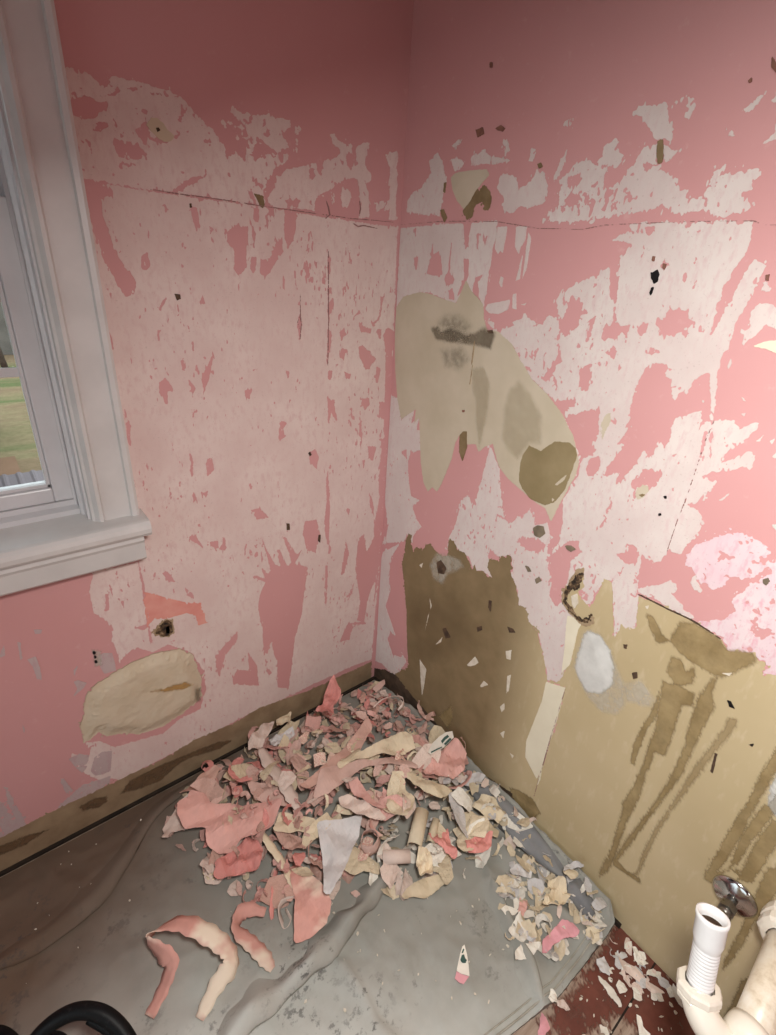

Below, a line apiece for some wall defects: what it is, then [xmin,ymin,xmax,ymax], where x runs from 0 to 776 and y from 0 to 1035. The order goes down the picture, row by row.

crack [150,189,759,230]
peeling [58,67,776,808]
peeling [0,787,26,837]
water stain [600,615,755,883]
water stain [704,750,776,968]
water stain [724,978,748,1016]